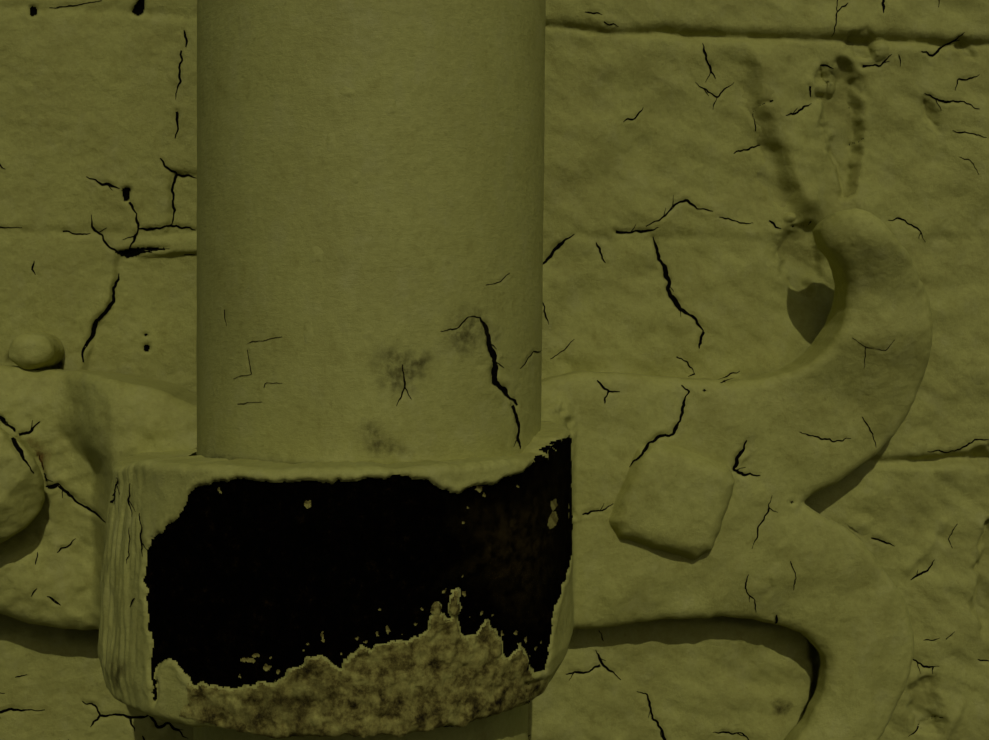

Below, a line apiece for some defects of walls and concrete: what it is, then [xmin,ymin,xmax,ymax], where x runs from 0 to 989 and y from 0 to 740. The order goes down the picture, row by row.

crack [175,30,188,138]
crack [734,64,834,154]
crack [832,0,848,36]
crack [863,32,965,68]
crack [63,158,196,362]
crack [442,316,574,449]
crack [543,195,811,467]
crack [0,416,147,564]
peeling [143,435,573,739]
crack [0,674,45,713]
crack [82,701,187,740]
crack [566,631,666,740]